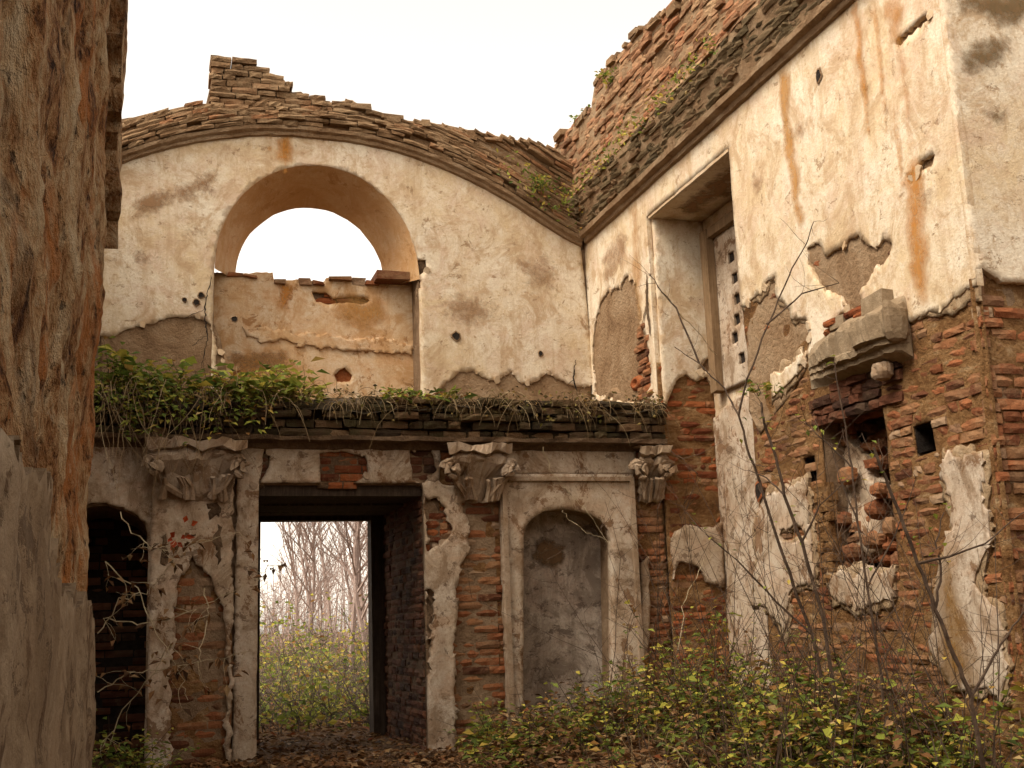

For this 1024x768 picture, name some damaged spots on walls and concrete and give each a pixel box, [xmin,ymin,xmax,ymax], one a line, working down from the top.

flaking render [809,236,892,315]
flaking render [101,312,226,397]
crack [185,277,212,368]
flaking render [334,369,351,382]
flaking render [160,534,169,566]
flaking render [207,502,223,564]
flaking render [317,451,371,490]
flaking render [426,498,452,551]
flaking render [438,274,731,700]
flaking render [741,274,1024,768]
flaking render [168,566,233,768]
flaking render [453,502,507,750]